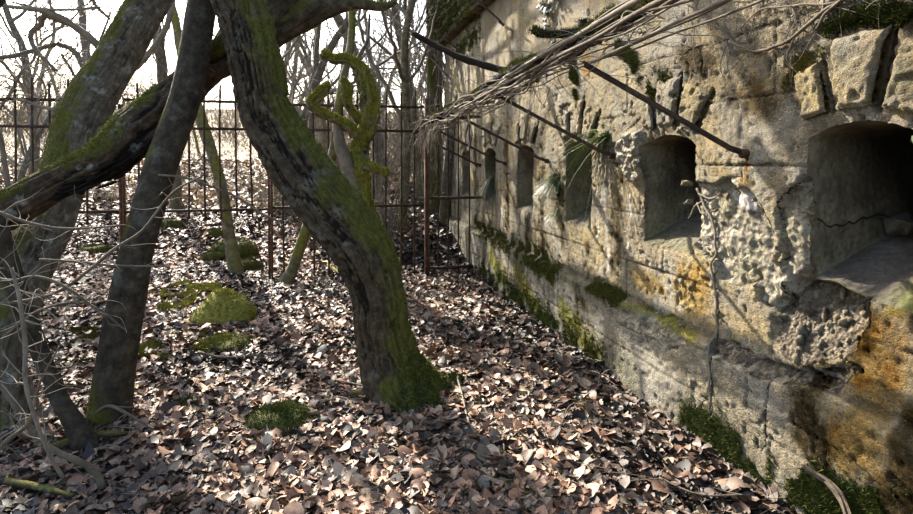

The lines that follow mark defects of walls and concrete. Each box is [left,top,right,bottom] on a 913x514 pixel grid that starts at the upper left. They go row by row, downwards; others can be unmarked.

crack [701,266,782,450]
spalling [680,178,872,391]
crack [803,429,870,475]
leakage [877,406,913,514]